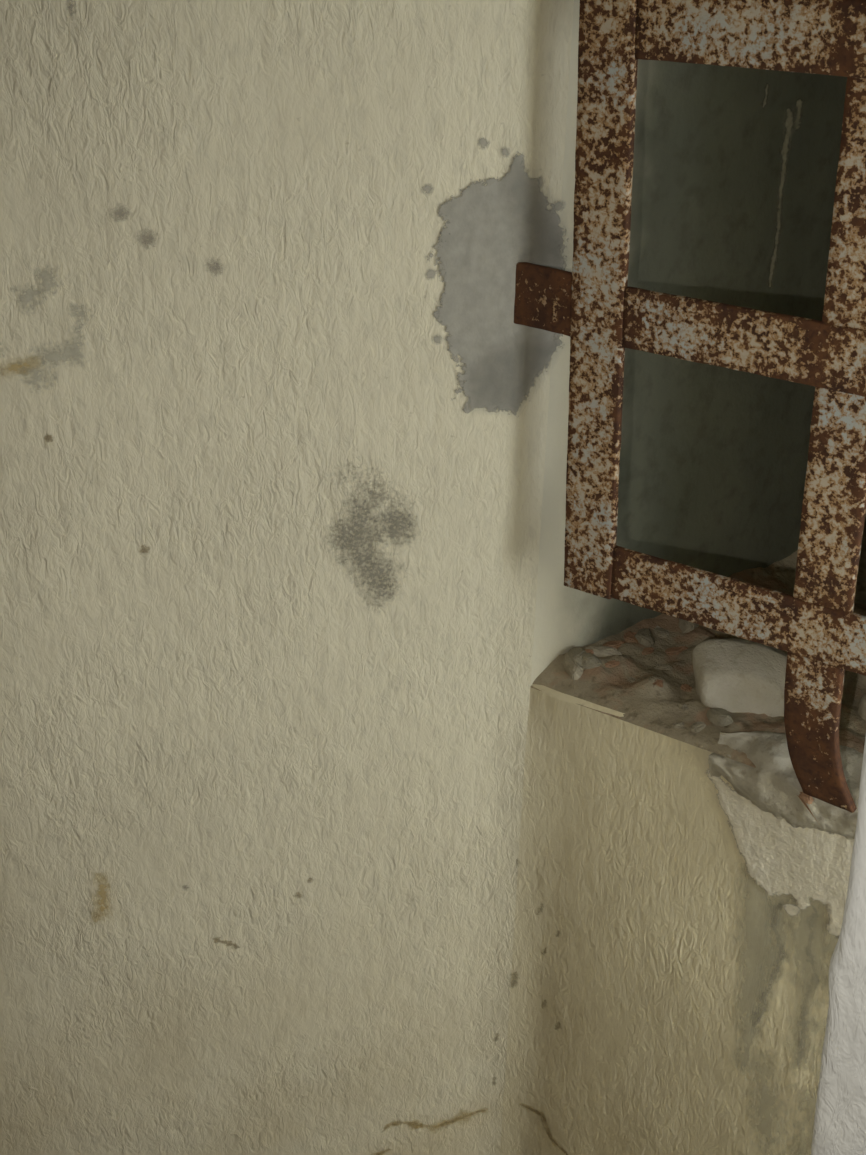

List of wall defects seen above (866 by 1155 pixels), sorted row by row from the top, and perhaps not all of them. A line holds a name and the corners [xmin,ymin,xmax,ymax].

flaking render [707,770,854,936]
crack [521,1105,567,1154]